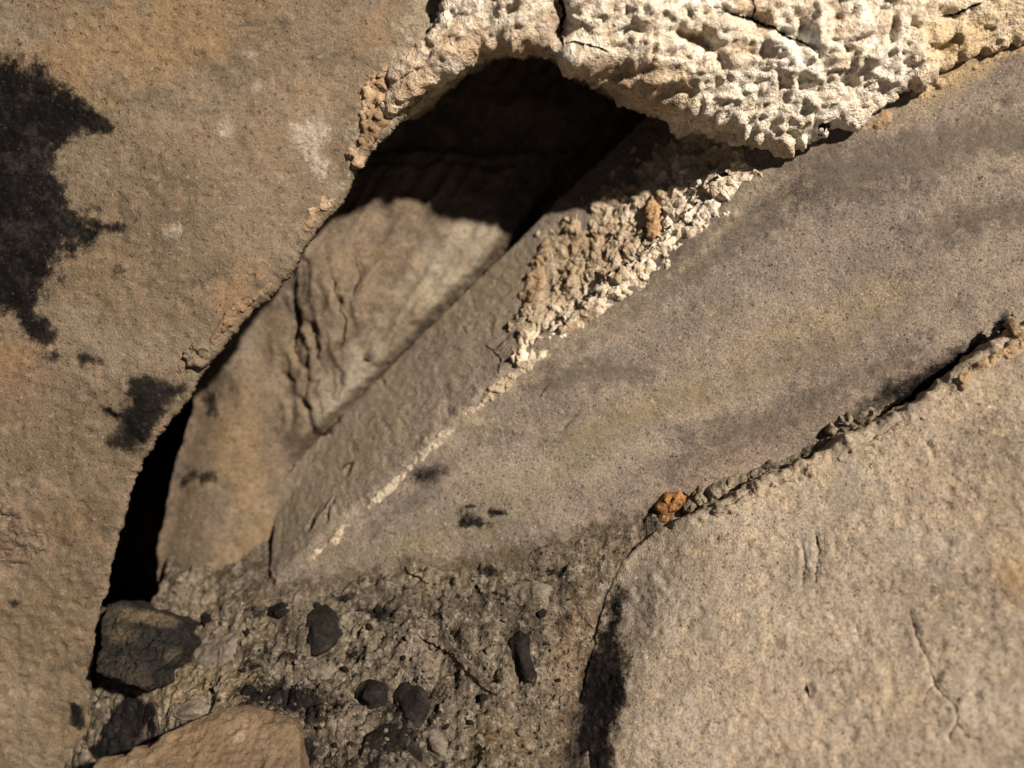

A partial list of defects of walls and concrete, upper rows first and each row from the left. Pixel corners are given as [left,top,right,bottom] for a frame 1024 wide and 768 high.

spalling [344,66,431,178]
water stain [0,43,127,361]
spalling [301,195,335,234]
water stain [78,353,103,367]
water stain [103,374,186,452]
spalling [182,276,280,369]
spalling [365,133,768,511]
spalling [832,414,926,461]
crack [881,347,971,413]
spalling [956,316,1024,392]
spalling [710,463,818,517]
spalling [306,524,351,562]